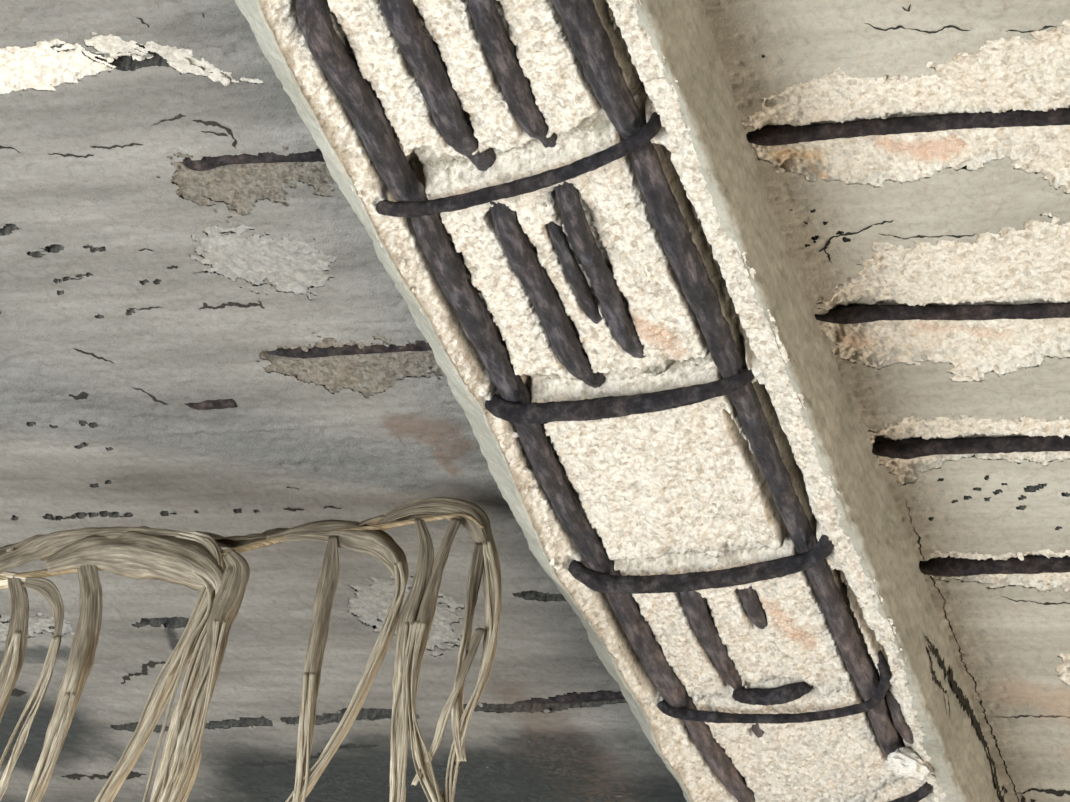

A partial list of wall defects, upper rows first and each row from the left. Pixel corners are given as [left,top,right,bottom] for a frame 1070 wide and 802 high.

crack [864,4,970,34]
crack [1005,25,1054,33]
spalling [0,32,263,95]
spalling [742,19,1070,193]
crack [814,220,975,263]
spalling [814,212,1070,382]
spalling [156,0,949,802]
spalling [868,414,1070,486]
spalling [951,475,1008,503]
spalling [1016,483,1047,510]
spalling [919,549,1070,592]
crack [906,505,1070,802]